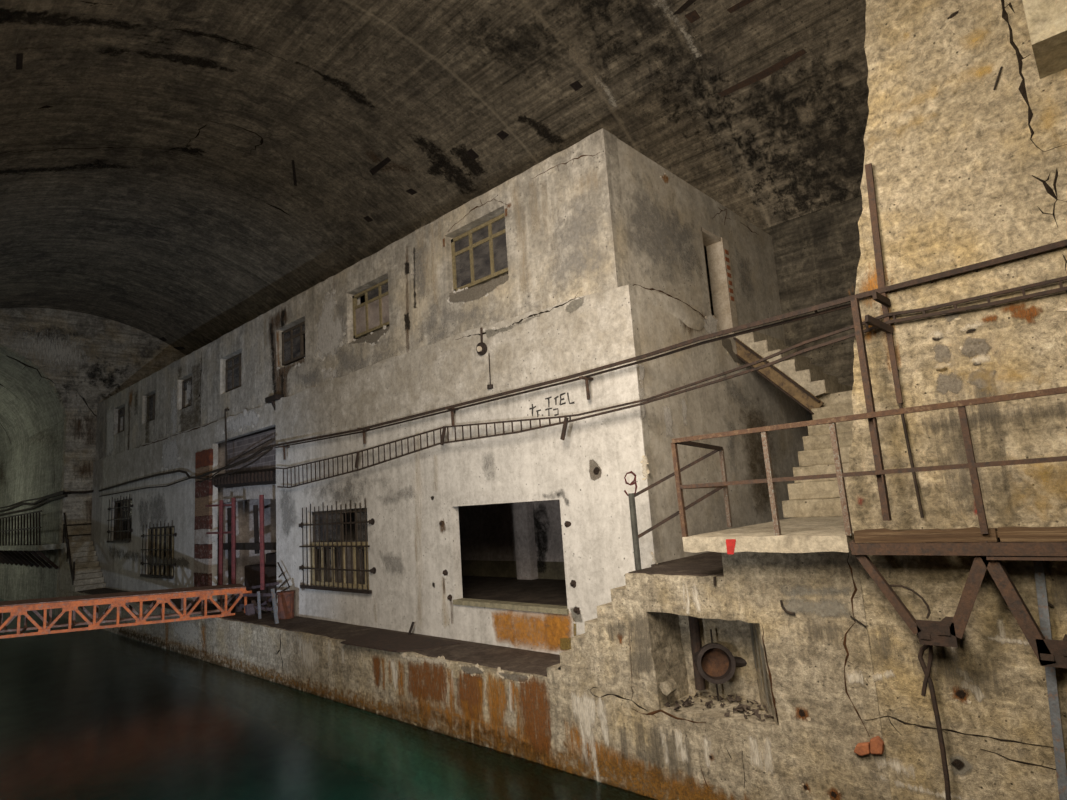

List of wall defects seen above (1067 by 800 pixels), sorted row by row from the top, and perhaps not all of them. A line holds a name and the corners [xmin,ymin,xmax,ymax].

efflorescence [654,0,701,57]
crack [1001,0,1067,227]
water stain [414,137,483,194]
crack [457,291,583,340]
corrosion [493,612,569,648]
crack [842,553,1056,770]
corrosion [118,623,734,800]